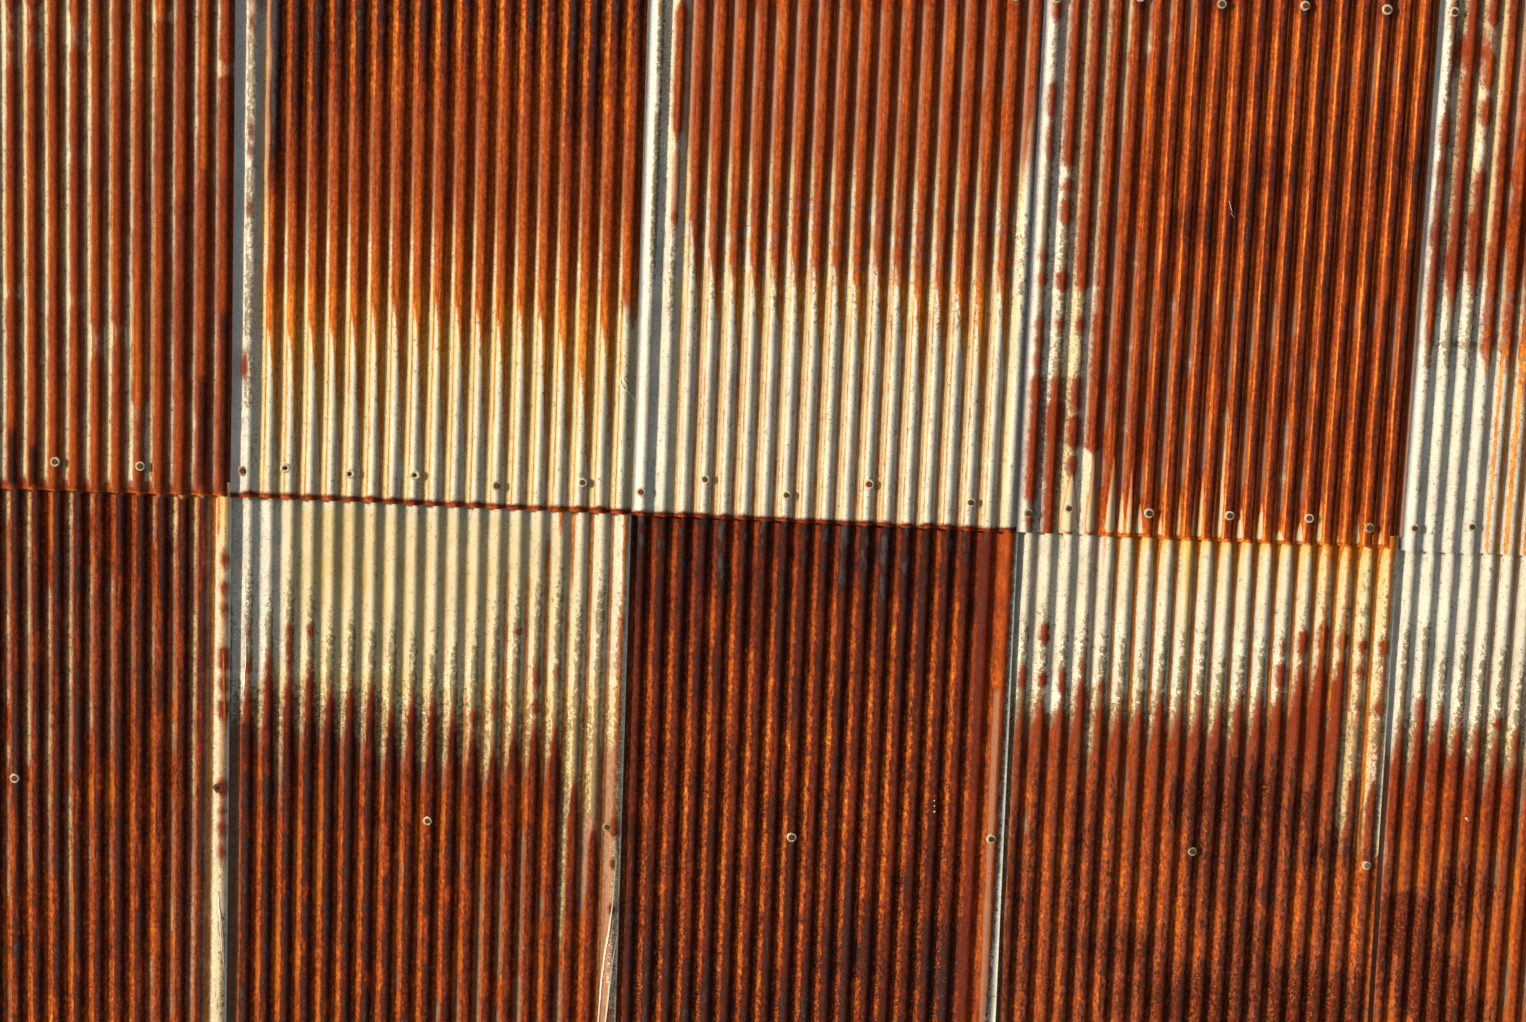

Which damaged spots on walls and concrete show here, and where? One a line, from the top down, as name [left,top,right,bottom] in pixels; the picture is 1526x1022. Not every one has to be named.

rust [0,0,1043,1022]
rust [999,0,1526,1022]